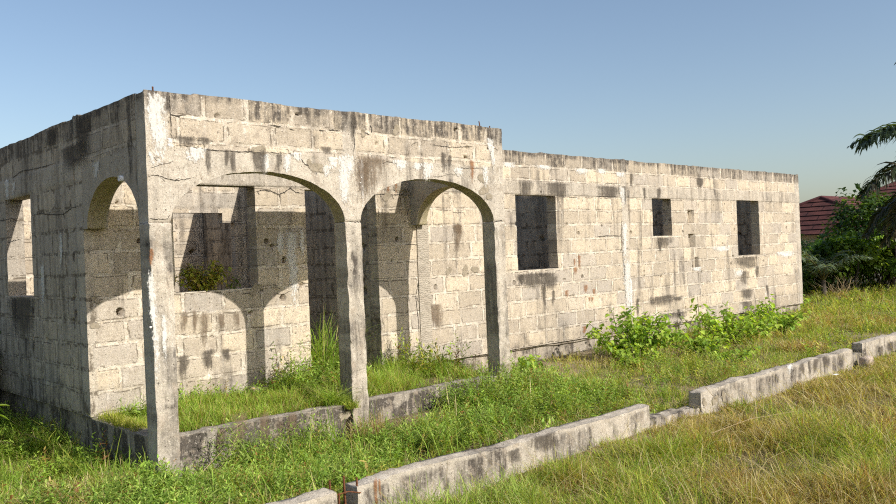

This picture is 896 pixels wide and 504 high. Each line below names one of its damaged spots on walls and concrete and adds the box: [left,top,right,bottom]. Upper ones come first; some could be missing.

damp [64,116,91,166]
damp [532,433,556,449]